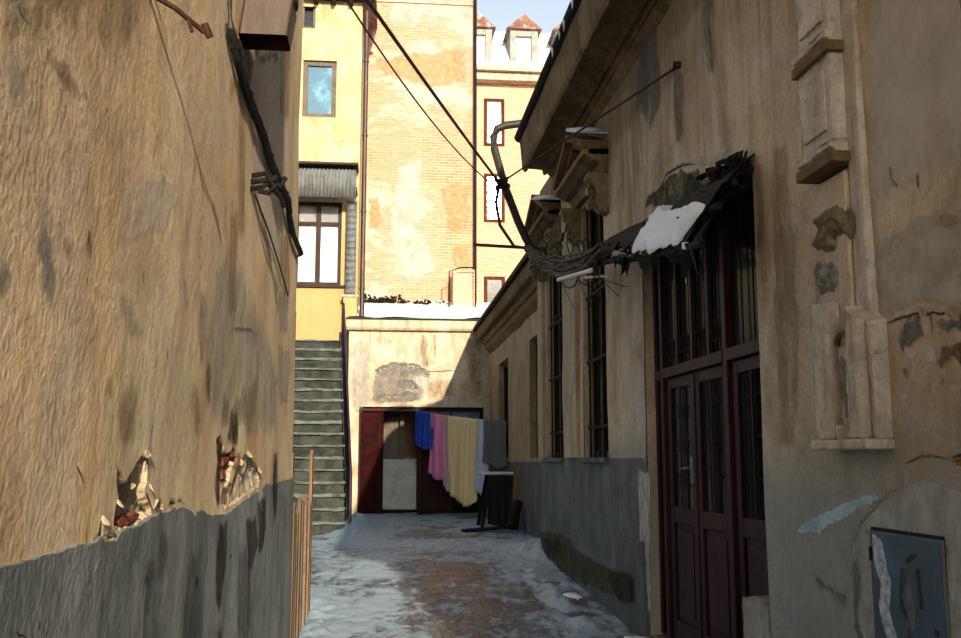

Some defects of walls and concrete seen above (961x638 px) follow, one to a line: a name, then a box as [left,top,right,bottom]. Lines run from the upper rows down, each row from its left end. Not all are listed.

spalling [899,316,923,351]
spalling [940,343,961,367]
spalling [373,361,430,403]
spalling [95,404,187,541]
spalling [216,433,263,511]
spalling [906,453,961,470]